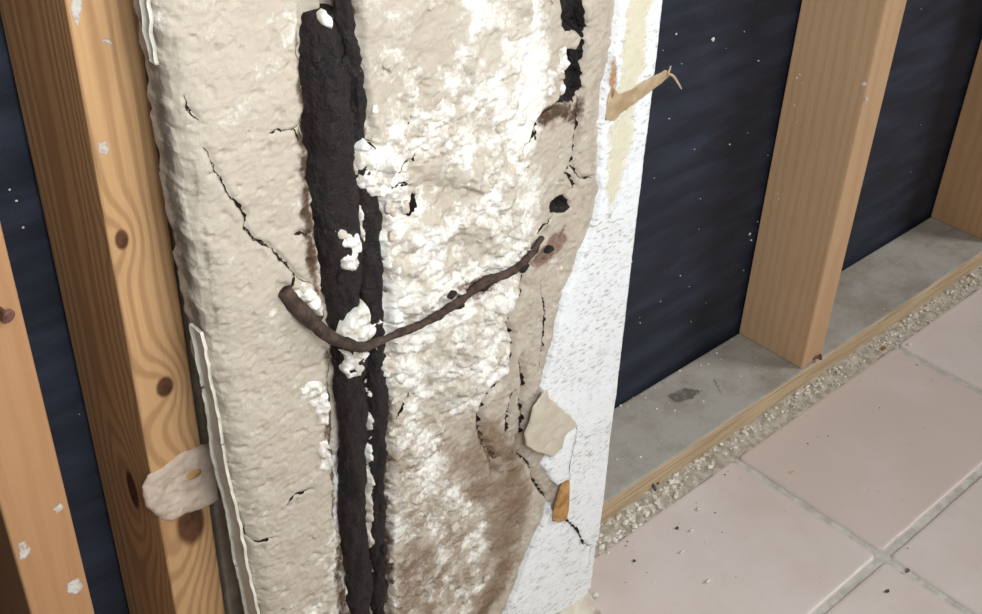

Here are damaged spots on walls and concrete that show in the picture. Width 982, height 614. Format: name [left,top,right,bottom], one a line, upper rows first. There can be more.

crack [203,147,310,287]
crack [271,125,298,141]
spalling [133,0,682,614]
crack [476,275,590,546]